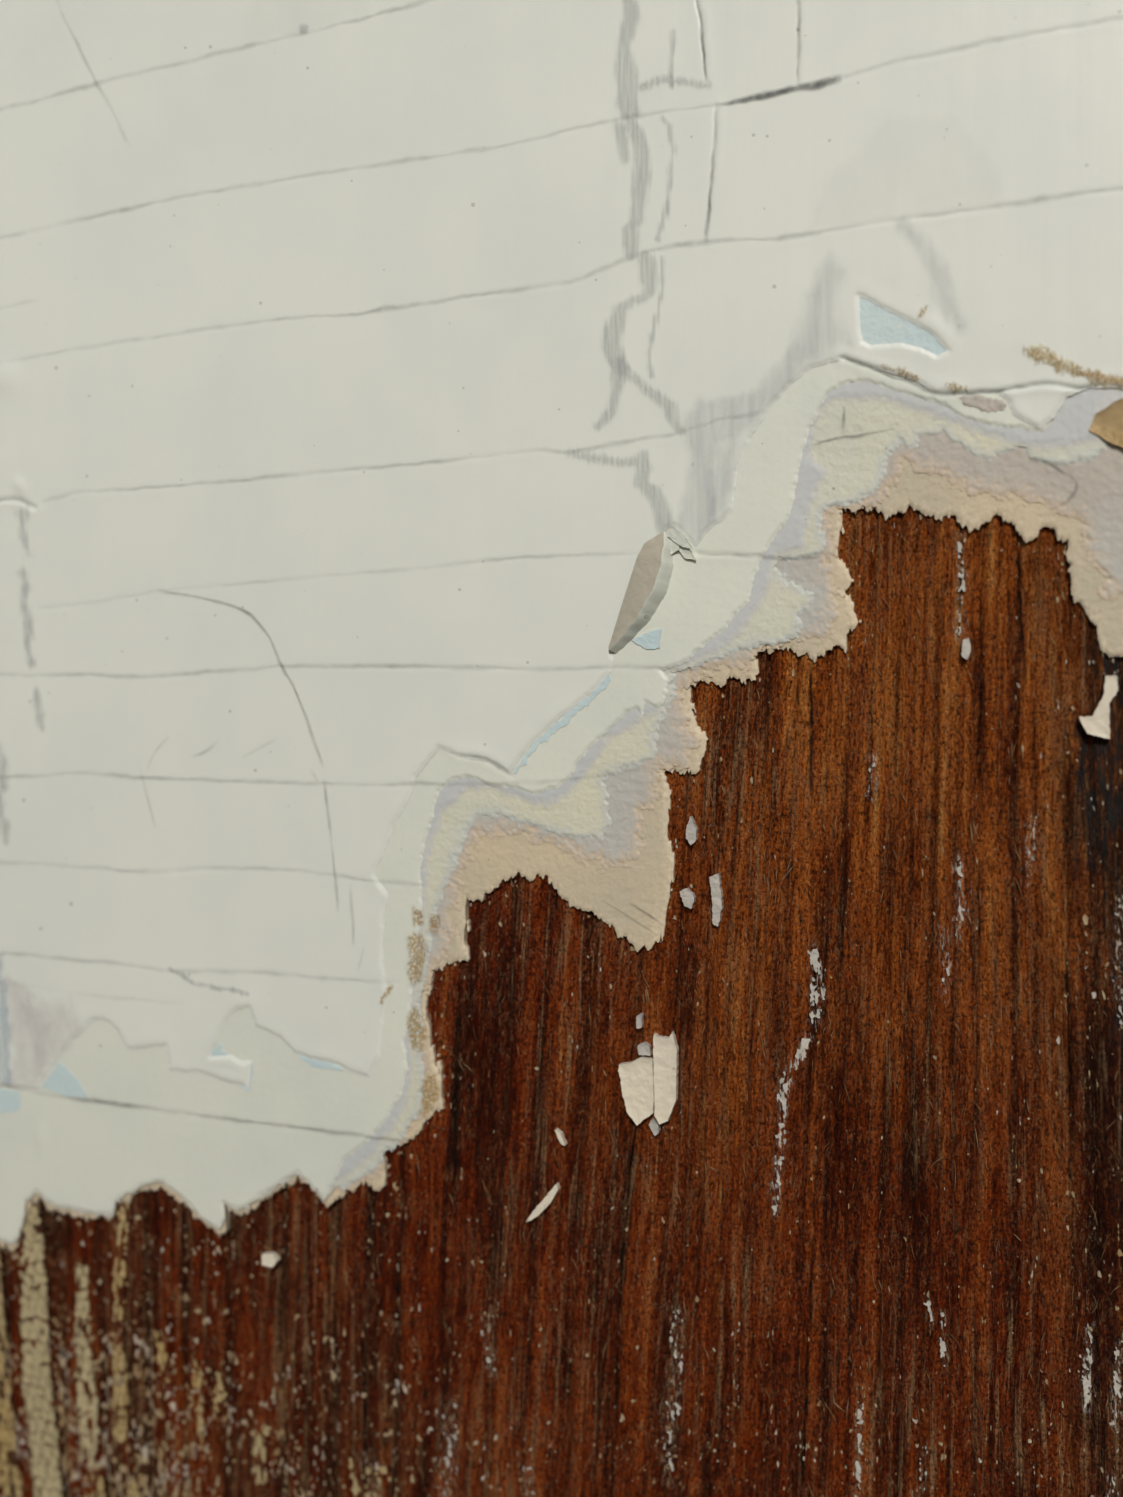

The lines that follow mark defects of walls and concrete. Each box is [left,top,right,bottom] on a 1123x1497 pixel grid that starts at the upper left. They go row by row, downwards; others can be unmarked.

crack [741,80,832,101]
peeling [859,297,946,355]
peeling [0,343,1123,1252]
peeling [262,1252,281,1268]
peeling [669,1309,683,1374]
peeling [924,1300,946,1367]
peeling [1081,1330,1093,1408]
peeling [1109,1341,1123,1425]
peeling [349,1458,399,1497]
peeling [435,1403,458,1497]
peeling [662,1401,681,1471]
peeling [854,1395,865,1497]